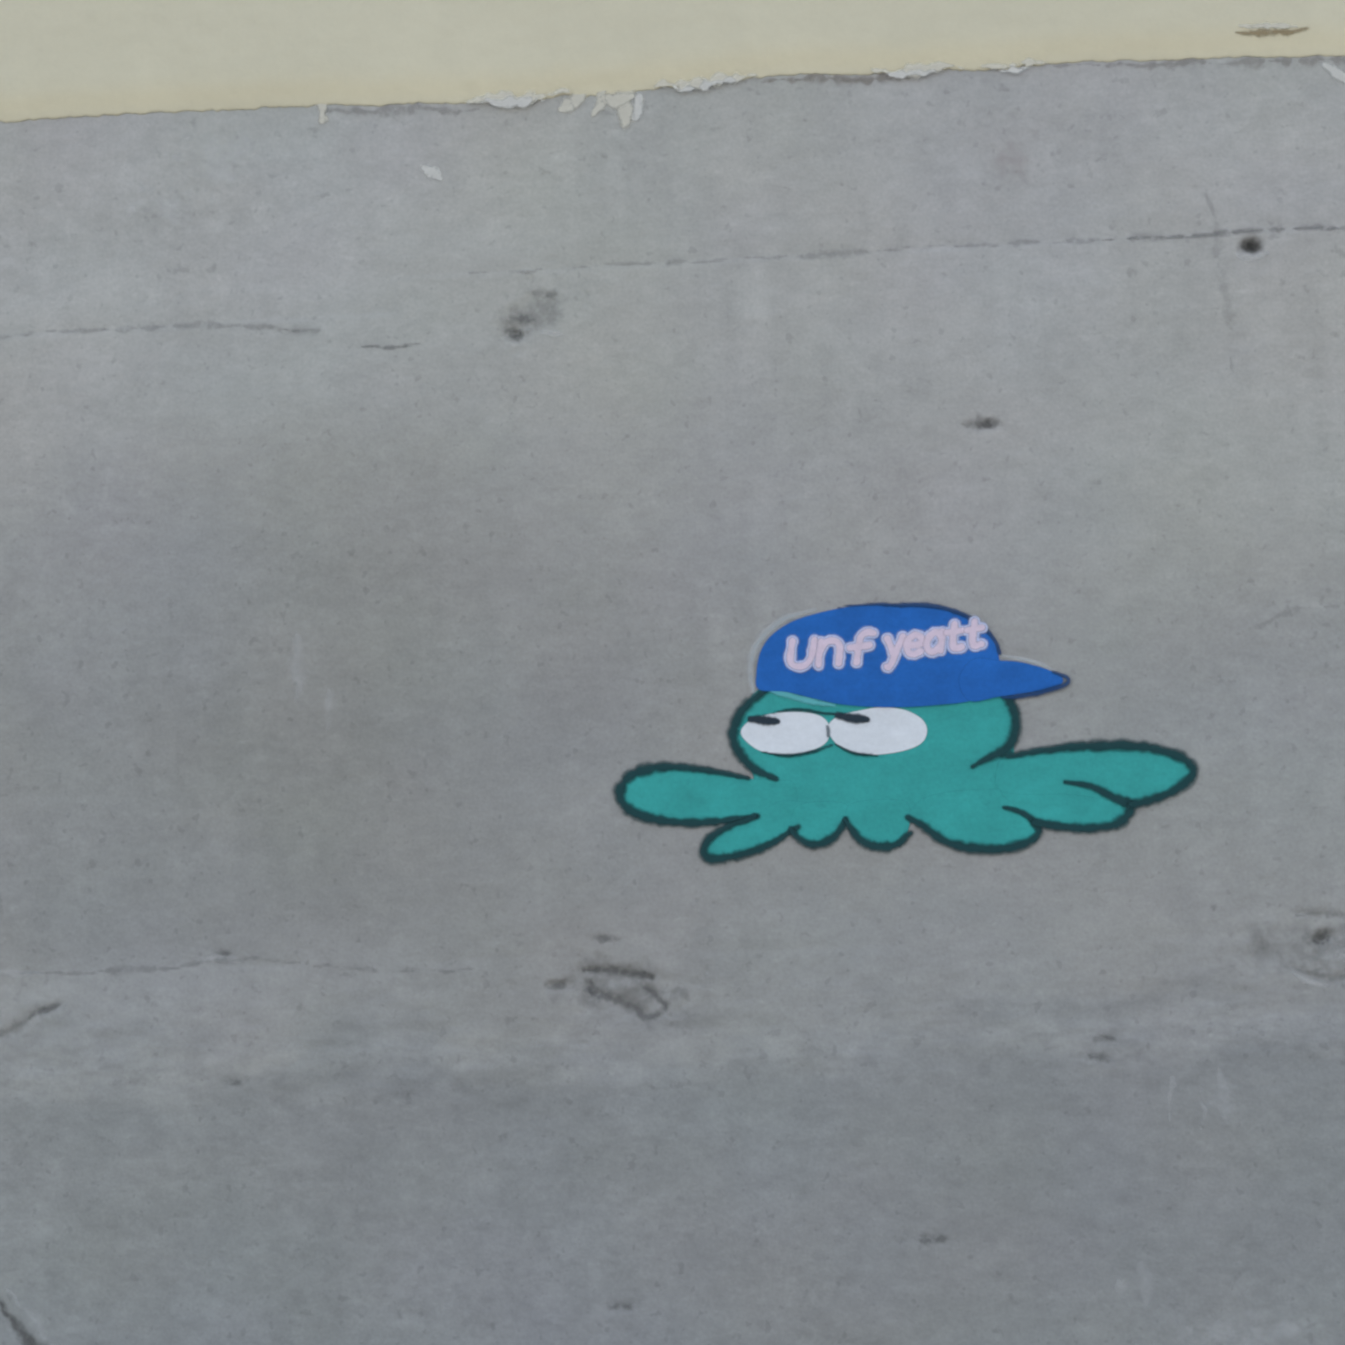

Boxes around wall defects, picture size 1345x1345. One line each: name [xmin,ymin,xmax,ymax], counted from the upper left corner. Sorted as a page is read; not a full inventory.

peeling [1236,23,1308,36]
peeling [655,73,756,92]
peeling [872,62,963,79]
peeling [981,58,1044,73]
peeling [1322,63,1345,83]
peeling [467,88,569,108]
crack [0,1302,34,1345]